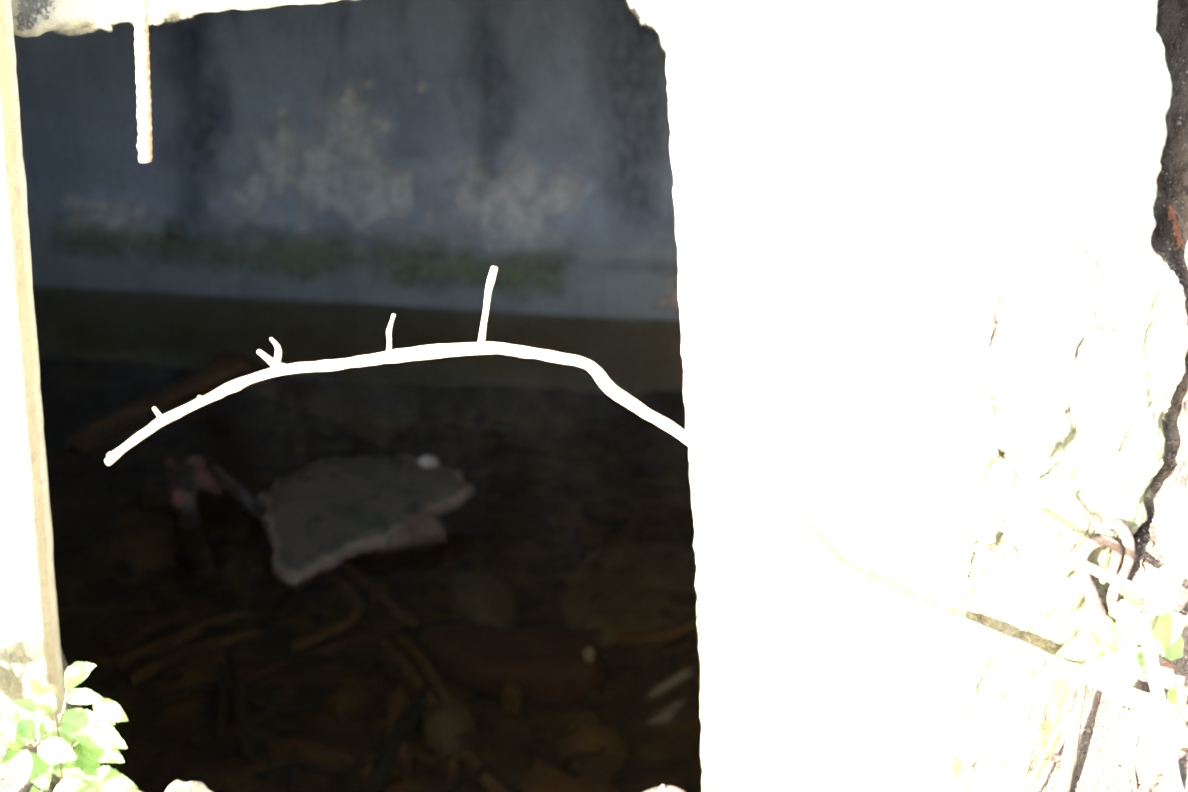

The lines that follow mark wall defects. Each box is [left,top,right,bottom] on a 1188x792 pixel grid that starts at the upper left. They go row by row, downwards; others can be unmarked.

spalling [60,23,110,34]
damp [229,90,412,236]
damp [626,8,658,187]